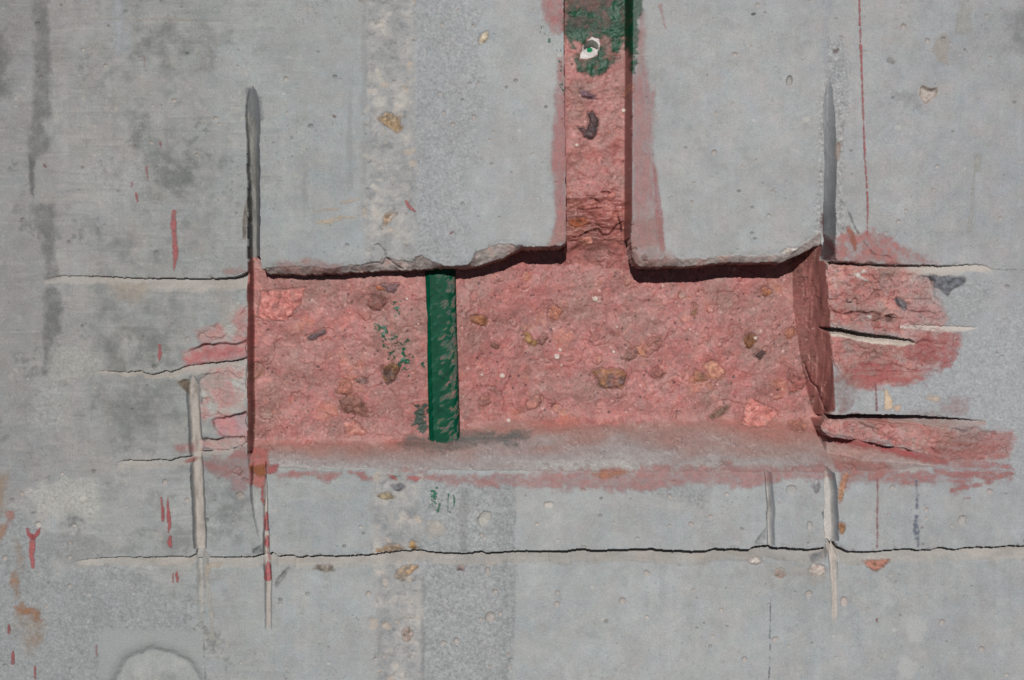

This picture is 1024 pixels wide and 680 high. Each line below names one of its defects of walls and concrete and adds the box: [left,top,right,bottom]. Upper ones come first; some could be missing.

flaking render [578,90,600,140]
spalling [178,0,566,451]
flaking render [568,217,594,247]
spalling [630,229,821,270]
crack [829,288,941,320]
spalling [826,260,966,391]
flaking render [593,335,662,389]
flaking render [722,334,767,360]
crack [858,362,922,374]
flaking render [709,405,731,420]
flaking render [741,399,778,428]
spalling [789,418,1016,465]